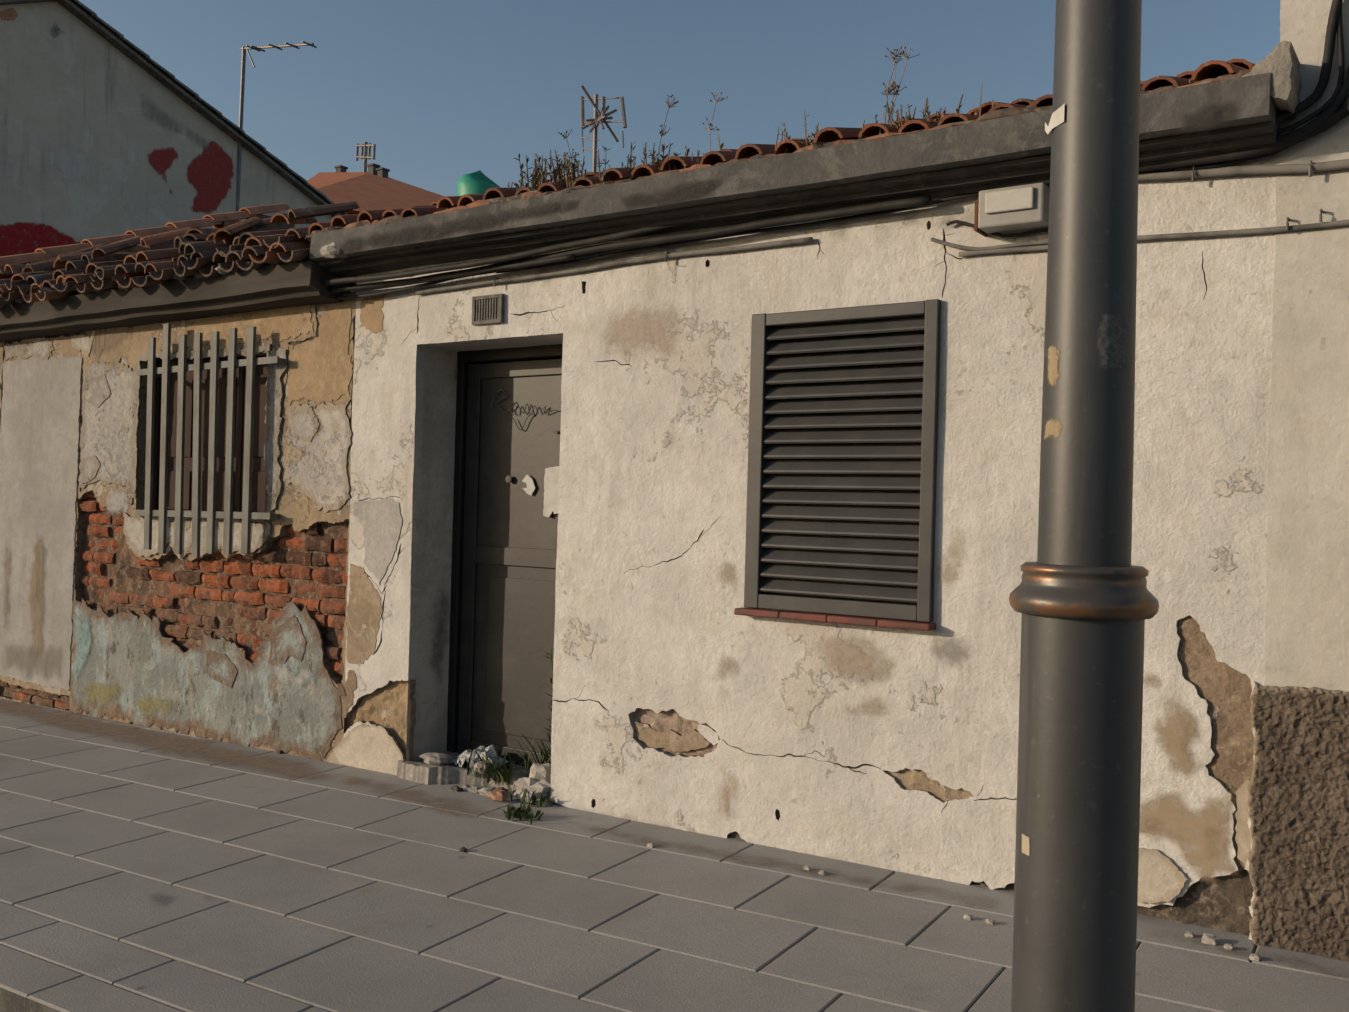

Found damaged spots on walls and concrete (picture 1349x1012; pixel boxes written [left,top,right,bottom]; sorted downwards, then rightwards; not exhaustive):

peeling [4,337,54,361]
flaking render [71,331,403,688]
crack [624,519,718,574]
flaking render [0,679,70,711]
spalling [344,679,417,761]
spalling [629,708,720,757]
crack [722,739,880,774]
peeling [1137,615,1255,936]